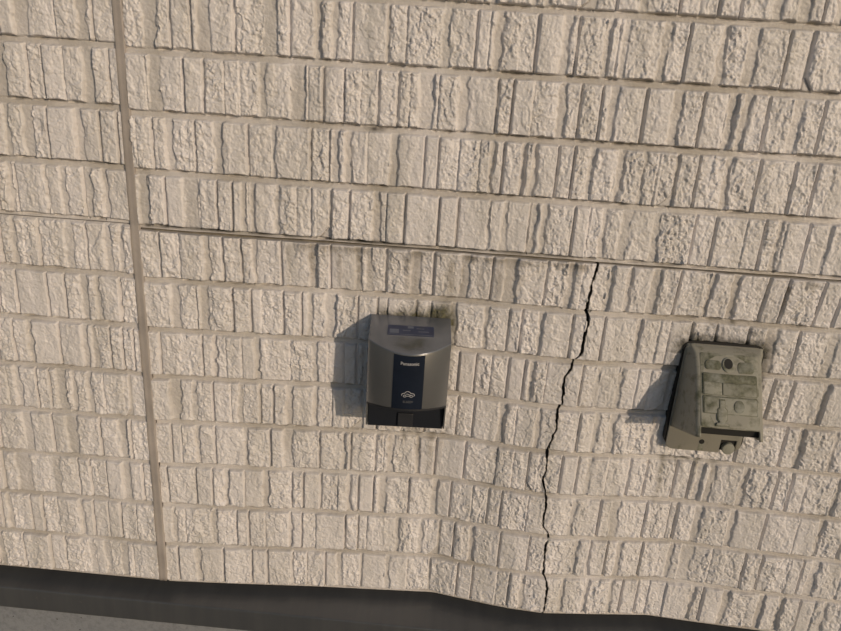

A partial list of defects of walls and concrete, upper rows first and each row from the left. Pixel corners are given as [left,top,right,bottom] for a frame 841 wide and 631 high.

crack [541,262,599,611]